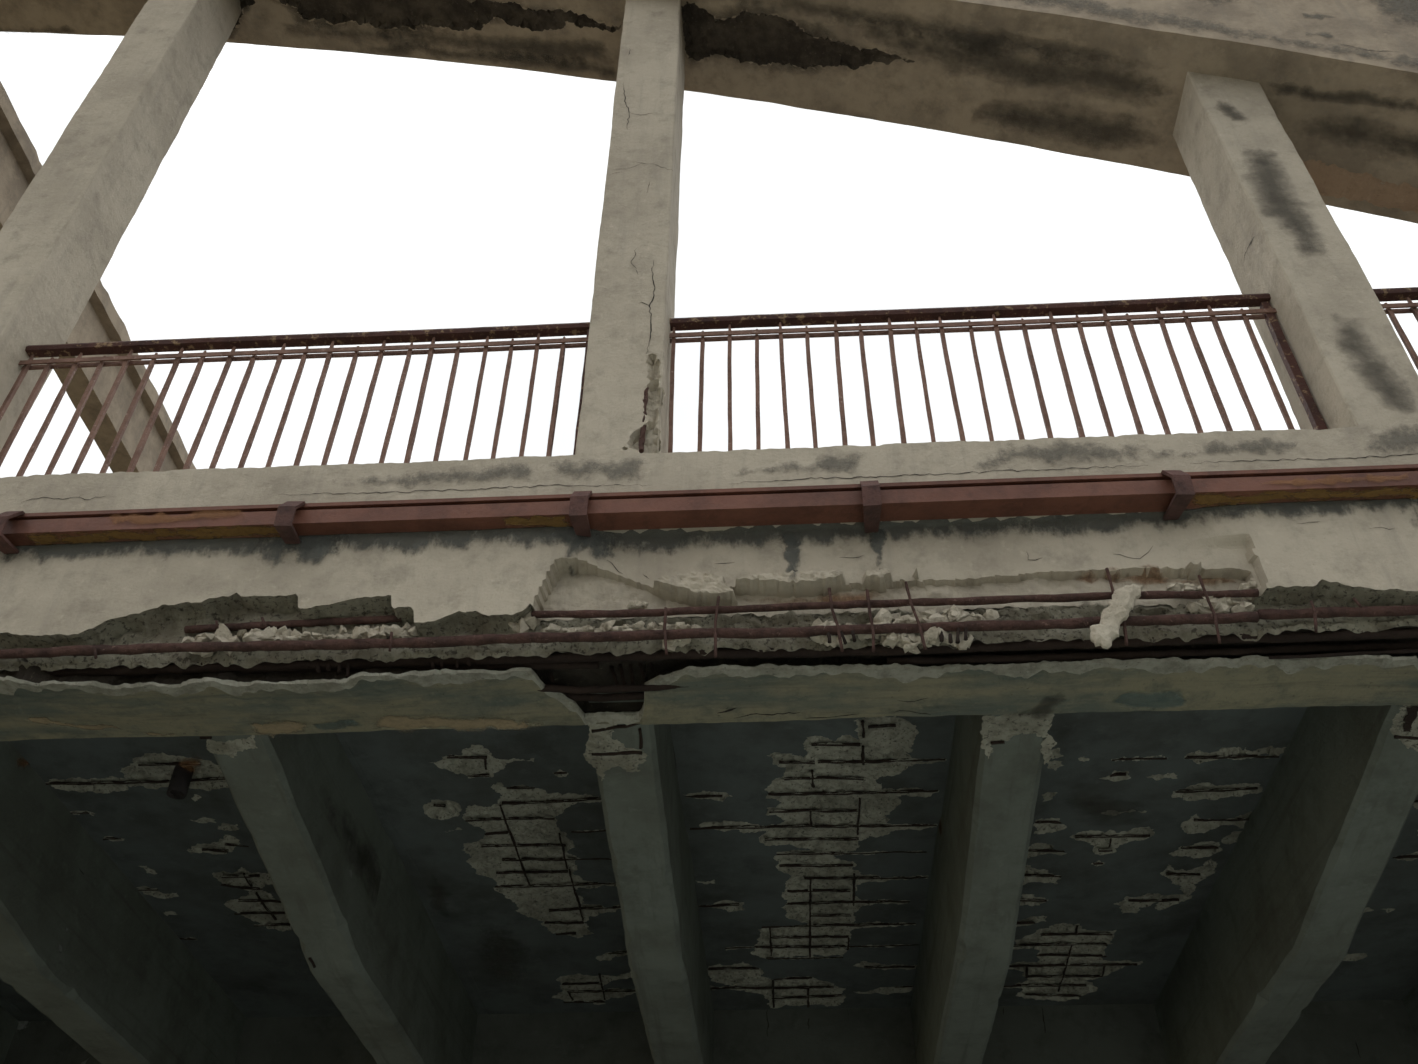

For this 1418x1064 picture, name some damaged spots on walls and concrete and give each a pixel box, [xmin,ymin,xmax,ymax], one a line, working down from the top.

water stain [809,8,1144,92]
water stain [1027,0,1236,33]
water stain [991,109,1135,142]
water stain [1281,86,1413,108]
water stain [1255,157,1312,249]
crack [631,248,655,352]
water stain [1344,330,1403,406]
spalling [0,567,1418,938]
spalling [690,716,946,1008]
spalling [1003,809,1155,1002]
spalling [552,950,636,1005]